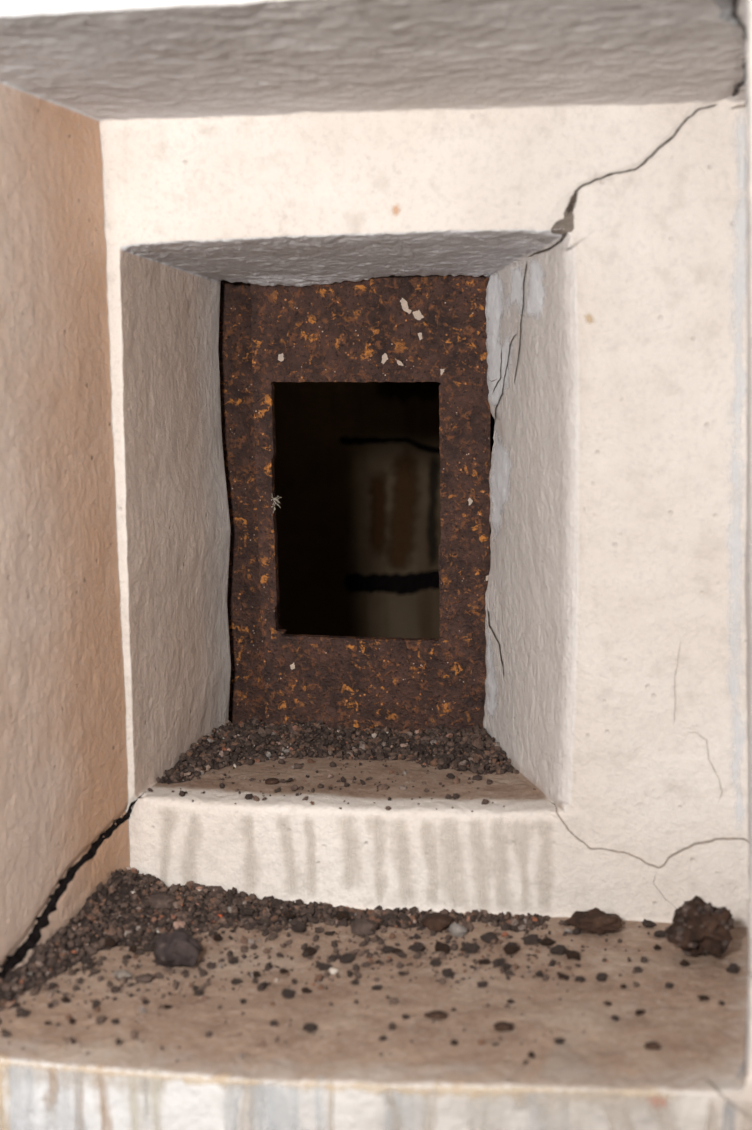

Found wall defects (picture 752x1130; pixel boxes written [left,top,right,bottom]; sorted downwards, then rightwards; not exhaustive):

crack [491,0,747,421]
crack [674,645,722,800]
crack [0,791,146,980]
crack [552,803,752,977]